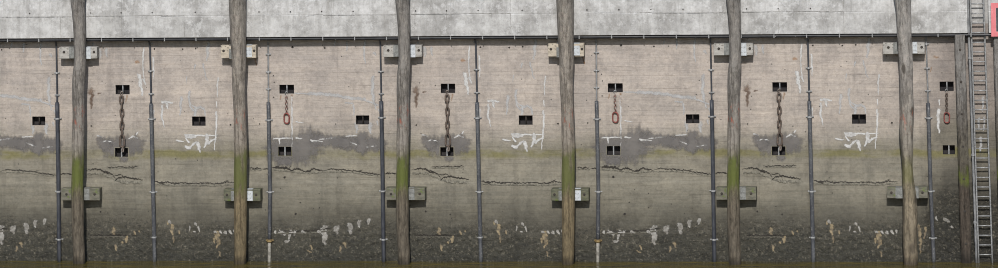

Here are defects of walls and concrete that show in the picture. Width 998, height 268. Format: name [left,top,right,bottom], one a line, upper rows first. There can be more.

crack [0,164,898,187]